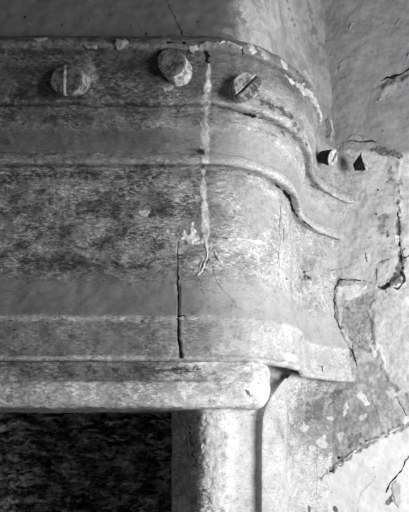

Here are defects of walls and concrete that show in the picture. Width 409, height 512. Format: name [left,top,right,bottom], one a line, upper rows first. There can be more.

crack [175,242,186,357]
crack [333,186,409,329]
peeling [341,285,409,383]
peeling [308,434,329,453]
peeling [352,391,370,406]
flaking render [319,415,409,480]